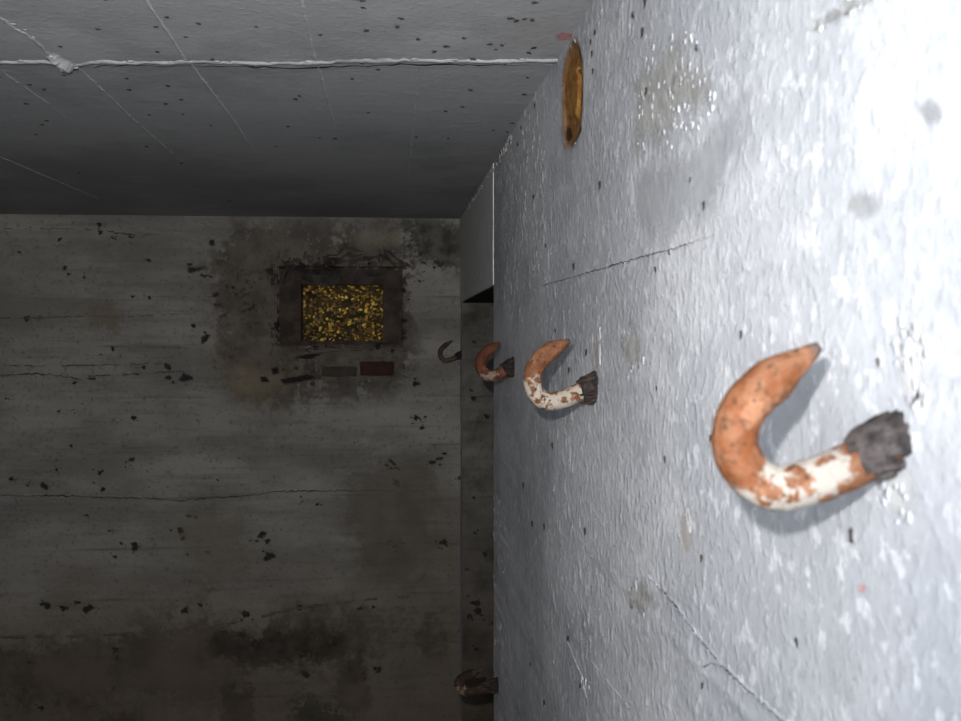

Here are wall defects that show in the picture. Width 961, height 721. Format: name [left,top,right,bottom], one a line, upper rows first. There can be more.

crack [79,61,552,72]
leakage [214,223,460,403]
crack [534,233,717,289]
leakage [0,615,394,721]
crack [648,575,789,721]